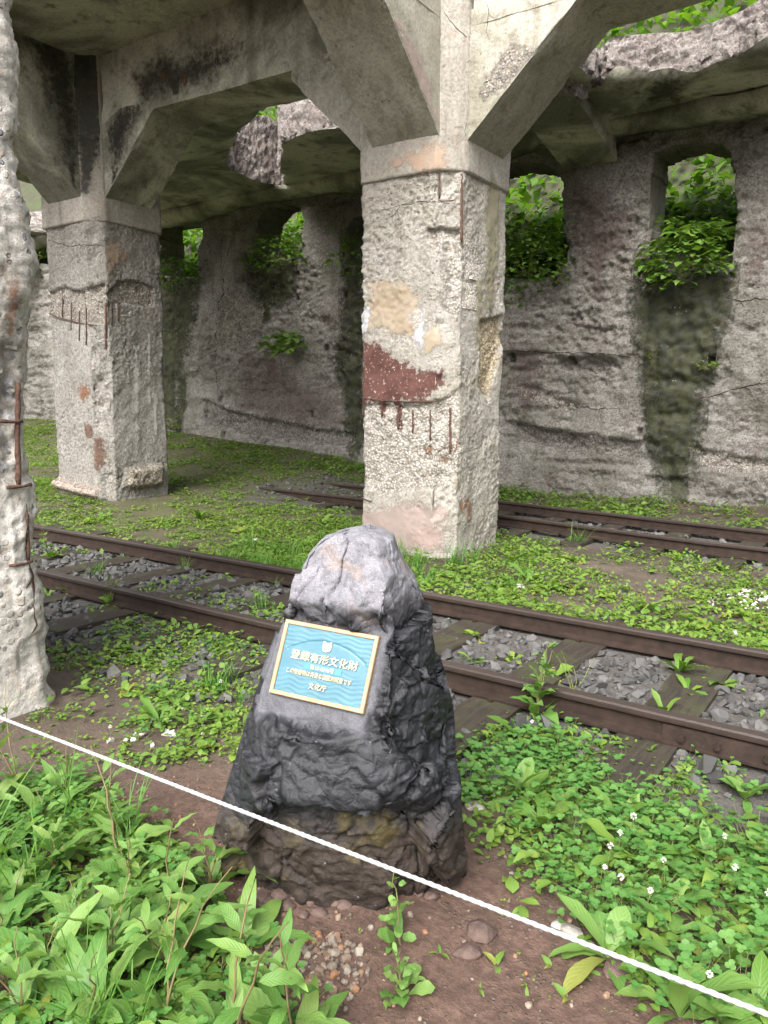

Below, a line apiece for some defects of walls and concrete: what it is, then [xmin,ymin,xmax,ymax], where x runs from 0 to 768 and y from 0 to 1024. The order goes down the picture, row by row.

leakage [28,38,238,194]
corrosion [84,424,106,470]
spalling [200,142,500,553]
corrosion [362,280,446,430]
leakage [625,261,741,503]